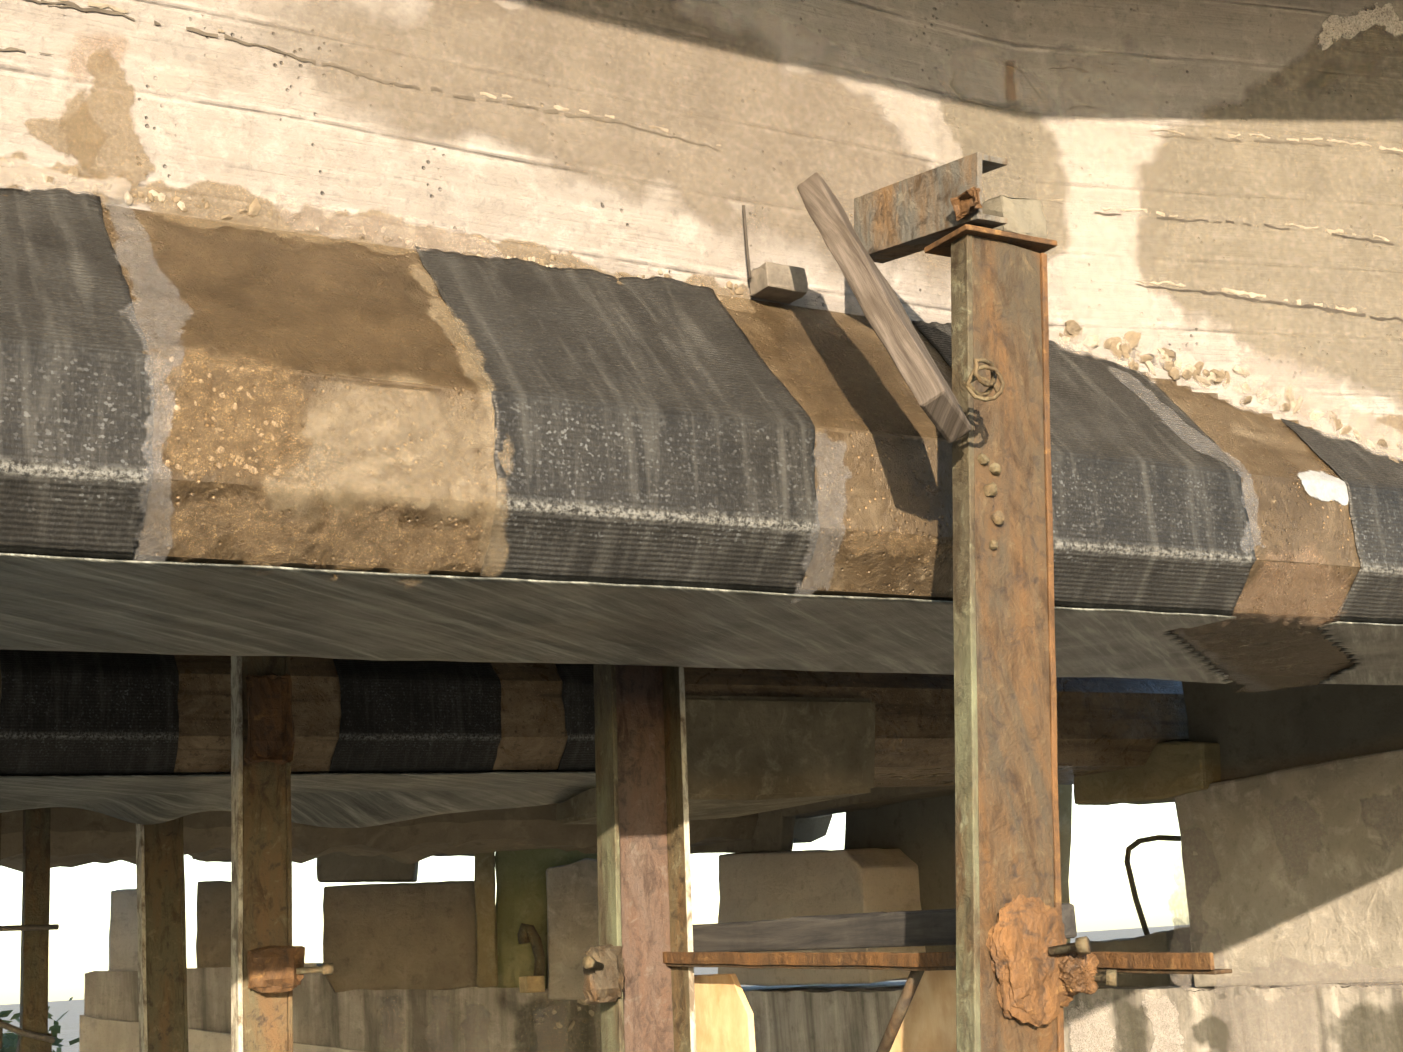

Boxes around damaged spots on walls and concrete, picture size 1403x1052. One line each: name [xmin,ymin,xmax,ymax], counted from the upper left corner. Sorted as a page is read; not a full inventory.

water stain [25,53,154,195]
water stain [316,0,1067,258]
water stain [914,251,951,271]
water stain [1140,2,1403,402]